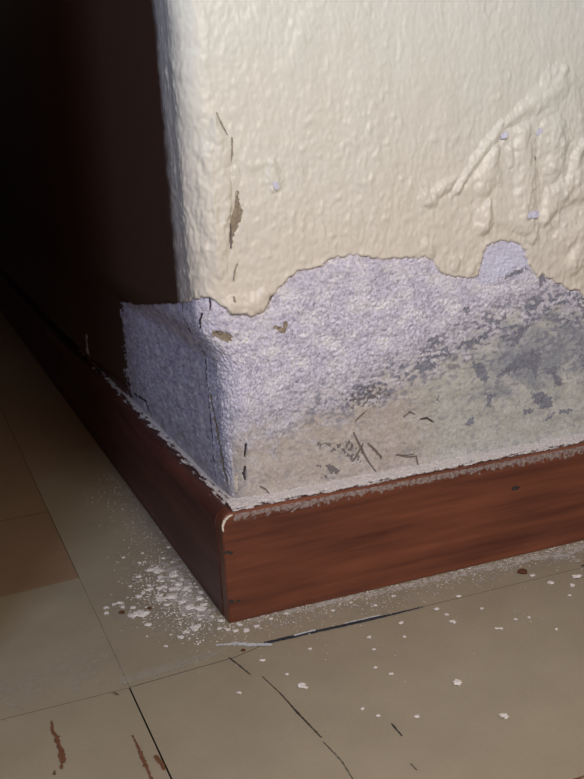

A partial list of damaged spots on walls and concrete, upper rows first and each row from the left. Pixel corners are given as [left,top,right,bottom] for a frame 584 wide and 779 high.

flaking render [119,240,584,498]